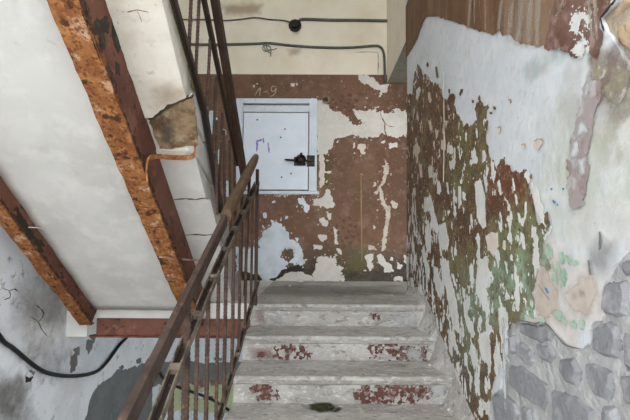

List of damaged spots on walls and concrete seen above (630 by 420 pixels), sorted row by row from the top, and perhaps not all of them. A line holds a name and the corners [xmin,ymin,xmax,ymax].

peeling [404,0,630,64]
corrosion [79,0,189,283]
flaking render [149,98,199,155]
corrosion [0,196,94,324]
peeling [235,62,630,420]
flaking render [70,335,96,373]